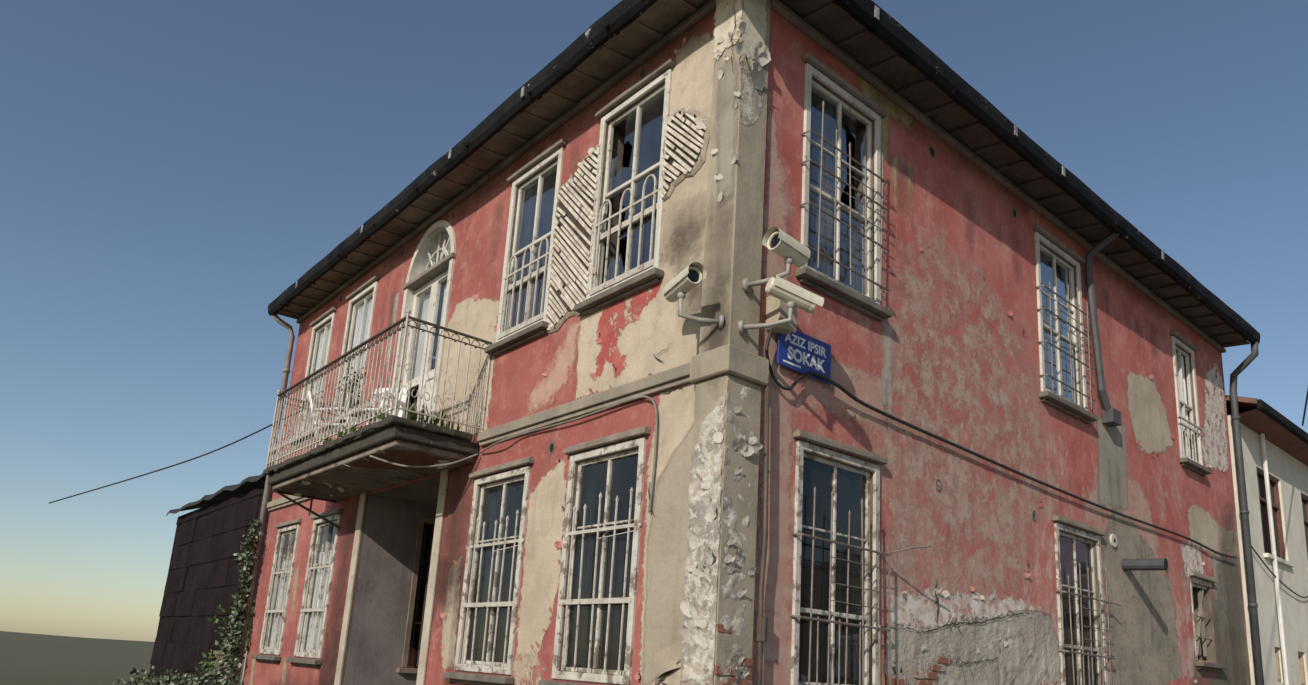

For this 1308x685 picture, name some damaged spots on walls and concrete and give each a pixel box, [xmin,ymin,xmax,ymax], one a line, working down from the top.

flaking render [530,0,794,410]
flaking render [436,294,500,434]
flaking render [513,458,567,685]
peeling [635,242,1061,685]
crack [893,579,1038,683]
flaking render [1127,372,1175,458]